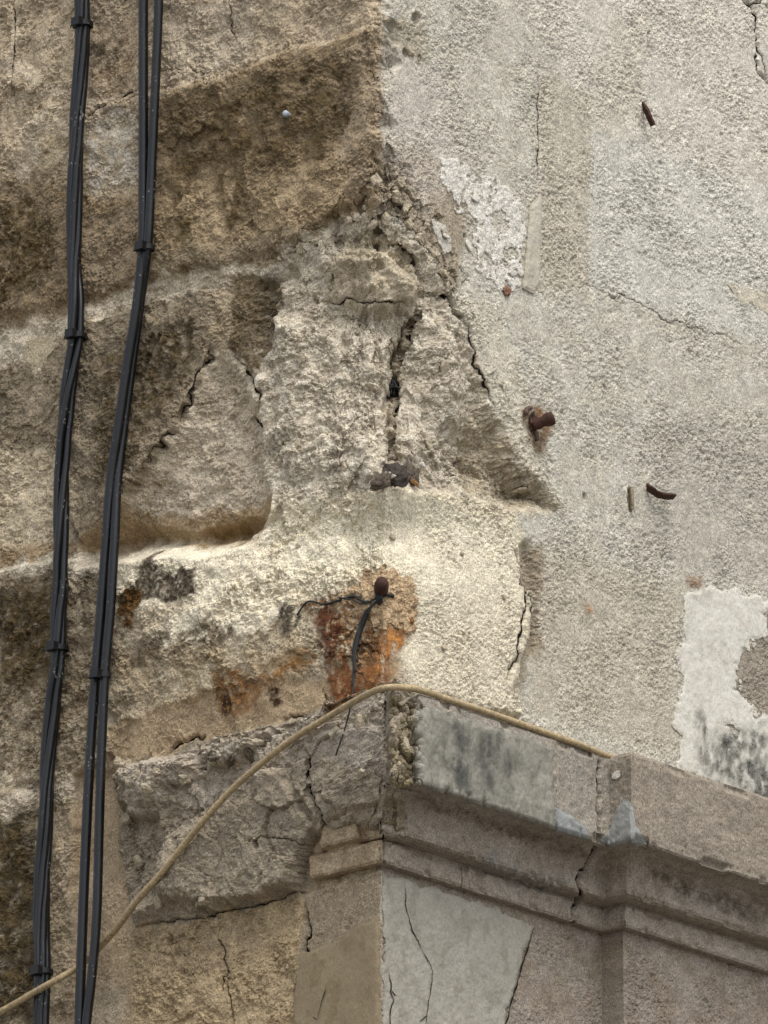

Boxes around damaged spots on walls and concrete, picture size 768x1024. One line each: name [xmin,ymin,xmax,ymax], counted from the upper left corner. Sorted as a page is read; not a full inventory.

corrosion [642,101,656,126]
crack [142,350,263,469]
spalling [119,143,561,554]
crack [439,294,495,407]
spalling [75,525,102,563]
corrosion [646,483,676,500]
corrosion [213,578,409,716]
crack [506,579,532,679]
peeling [671,583,768,795]
spalling [117,694,647,928]
crack [404,884,433,1022]
crack [505,929,534,1024]